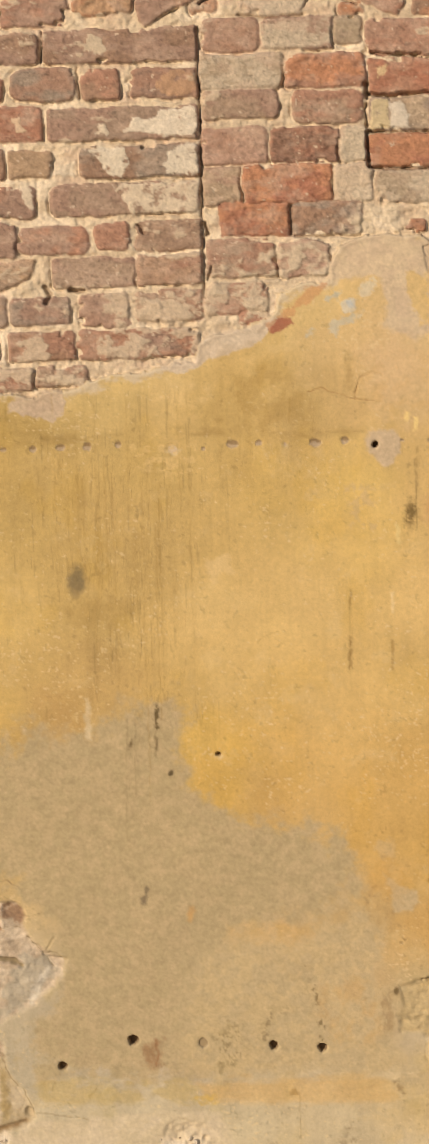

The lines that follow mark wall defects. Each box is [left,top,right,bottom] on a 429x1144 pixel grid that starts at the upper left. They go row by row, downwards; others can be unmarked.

peeling [6,387,68,426]
damp [0,339,372,843]
peeling [156,228,429,376]
peeling [0,676,429,1144]